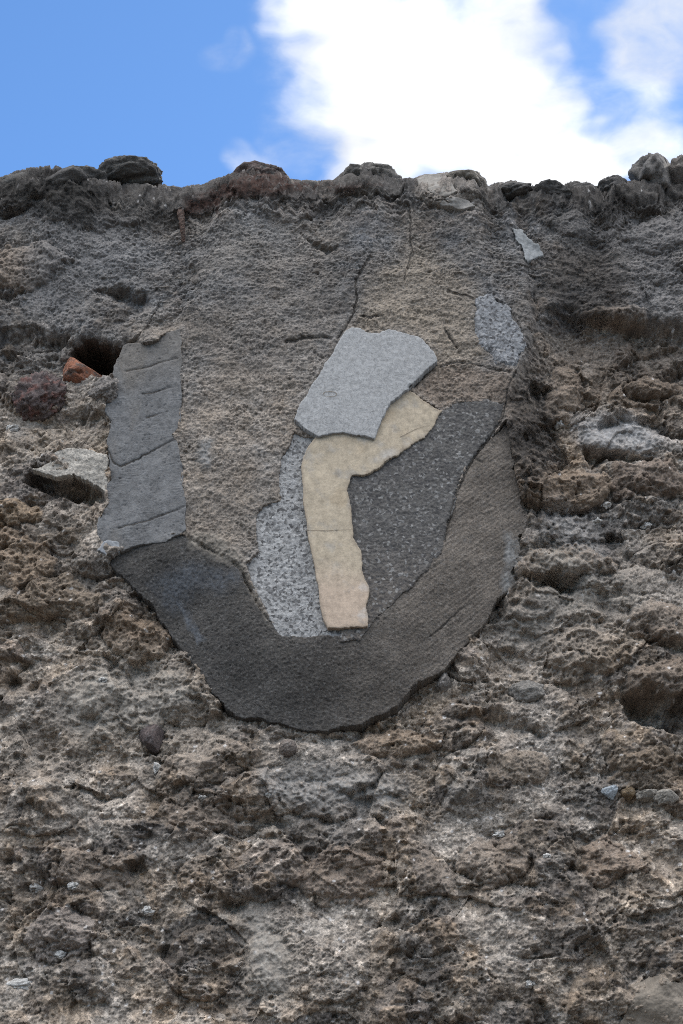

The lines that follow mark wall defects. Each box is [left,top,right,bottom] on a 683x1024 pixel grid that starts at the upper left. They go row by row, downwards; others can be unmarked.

crack [286,253,382,342]